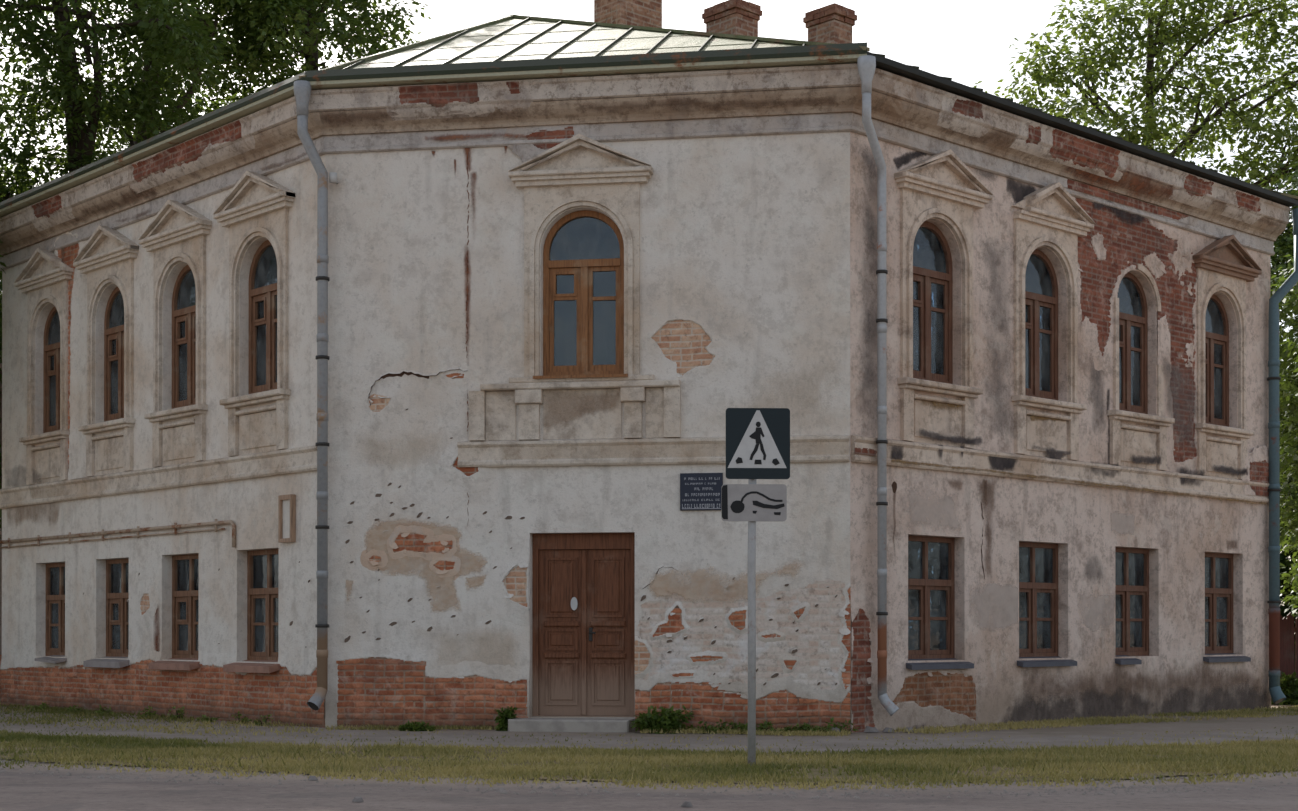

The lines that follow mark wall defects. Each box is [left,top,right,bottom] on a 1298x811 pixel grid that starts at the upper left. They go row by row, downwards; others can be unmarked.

spalling [127,116,255,194]
spalling [385,80,589,163]
spalling [937,92,994,138]
spalling [1009,118,1267,474]
spalling [427,356,480,397]
spalling [640,304,730,393]
spalling [0,482,529,729]
peeling [635,564,988,732]